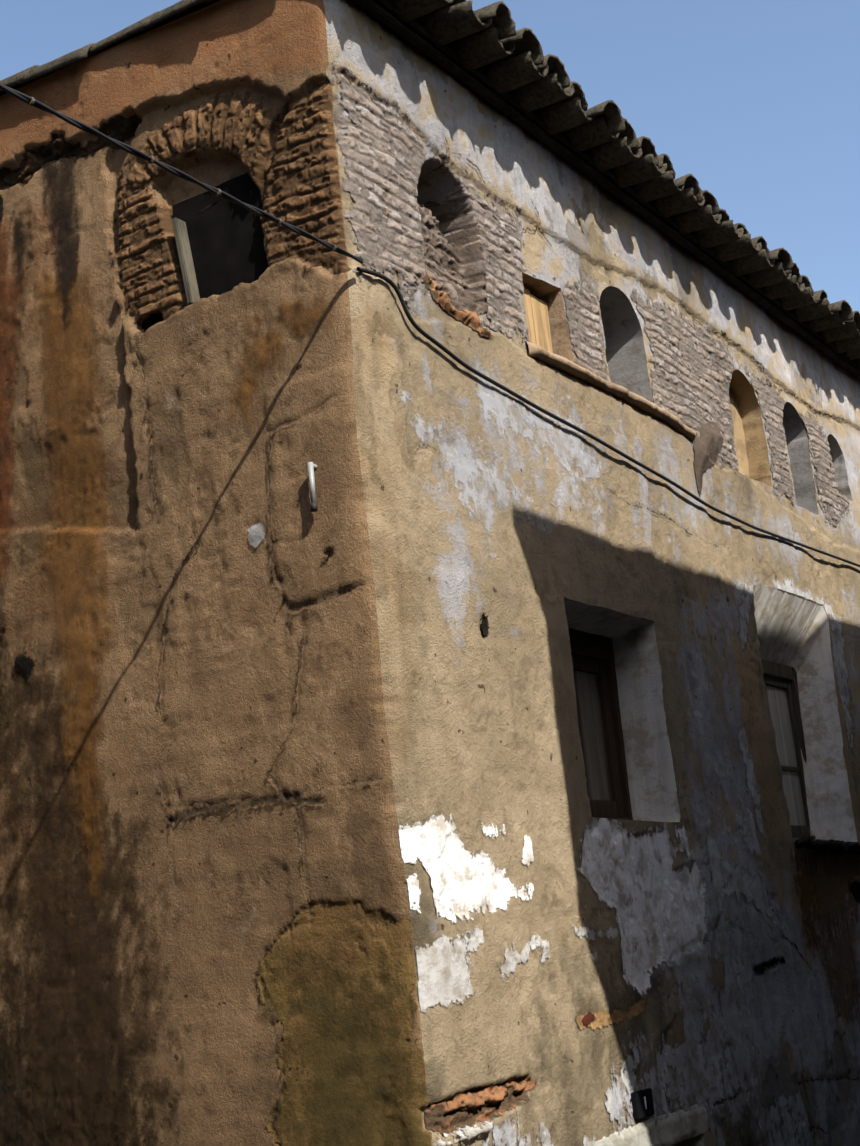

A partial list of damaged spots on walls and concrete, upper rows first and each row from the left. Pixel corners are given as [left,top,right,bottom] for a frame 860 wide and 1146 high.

water stain [0,211,25,580]
water stain [43,155,81,329]
flaking render [0,60,530,344]
water stain [0,642,179,1146]
crack [133,344,383,1139]
peeling [256,814,553,1146]
peeling [572,817,811,1146]
peeling [738,576,757,653]
peeling [737,727,764,835]
peeling [773,579,854,751]